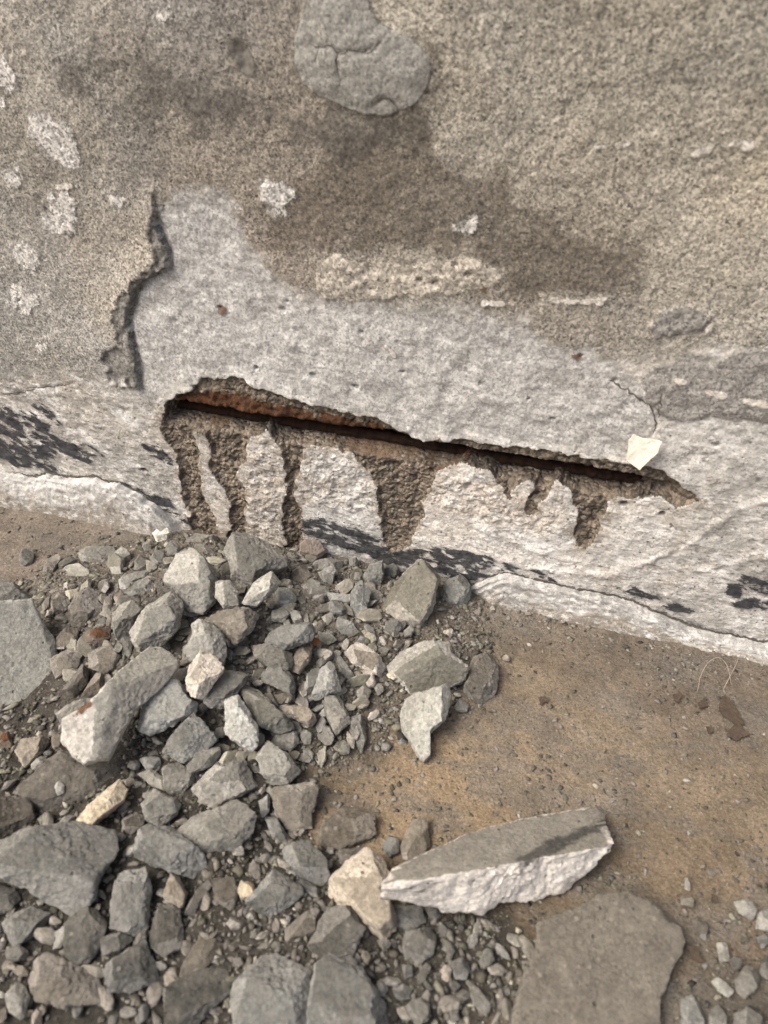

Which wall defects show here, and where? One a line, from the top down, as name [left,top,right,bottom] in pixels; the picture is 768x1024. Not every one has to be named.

water stain [480,299,515,307]
water stain [542,297,607,306]
peeling [103,192,699,552]
rust [178,390,388,431]
crack [609,380,663,434]